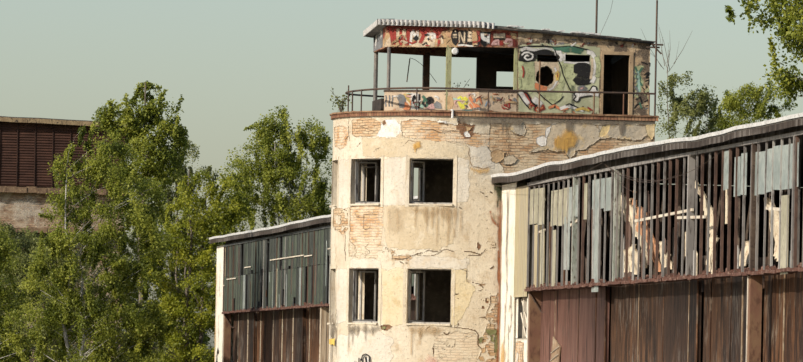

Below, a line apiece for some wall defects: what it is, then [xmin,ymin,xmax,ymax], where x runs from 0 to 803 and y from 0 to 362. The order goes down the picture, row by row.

spalling [335,118,386,149]
spalling [401,117,655,173]
spalling [334,205,412,263]
crack [394,238,521,362]
spalling [476,280,499,362]